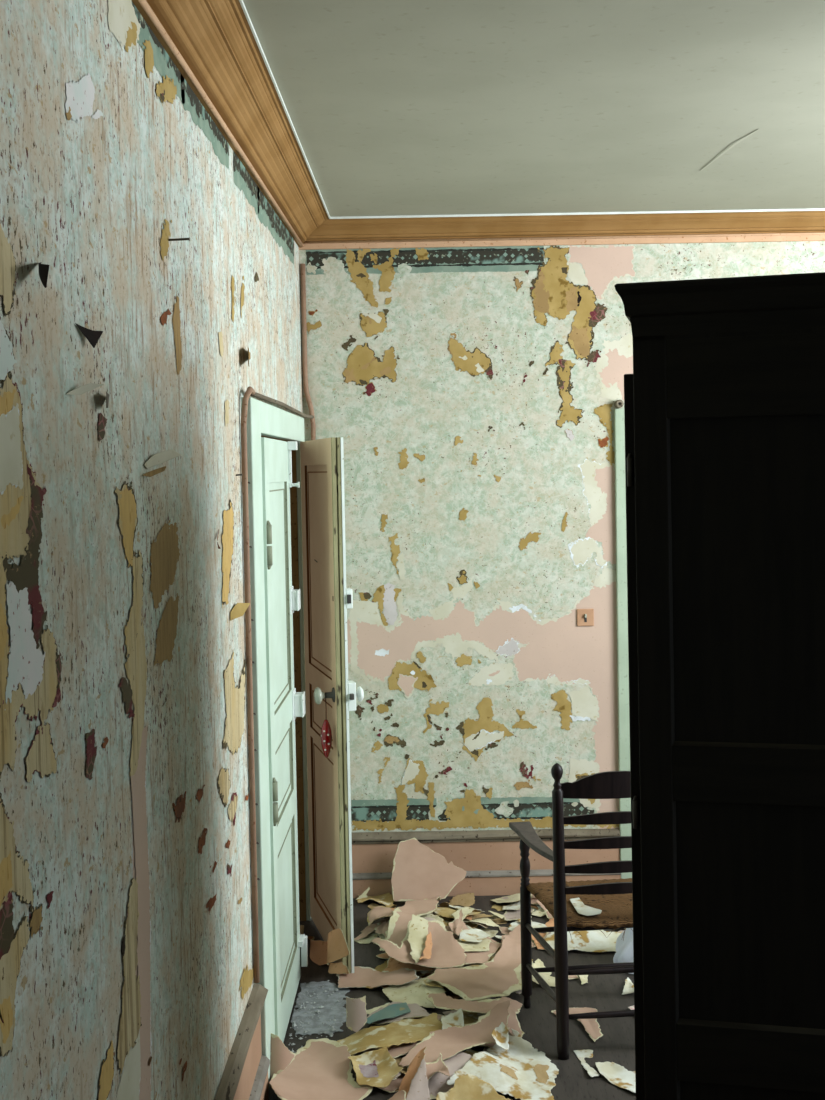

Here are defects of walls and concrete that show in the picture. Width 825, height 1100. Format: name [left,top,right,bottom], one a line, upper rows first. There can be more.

peeling [65,73,103,124]
peeling [108,0,177,104]
peeling [160,219,172,260]
peeling [161,296,182,375]
peeling [98,413,107,442]
peeling [222,499,234,609]
peeling [342,245,636,831]
peeling [0,224,62,1057]
peeling [85,729,109,780]
peeling [98,481,180,1100]
peeling [218,767,249,826]
peeling [222,652,246,755]